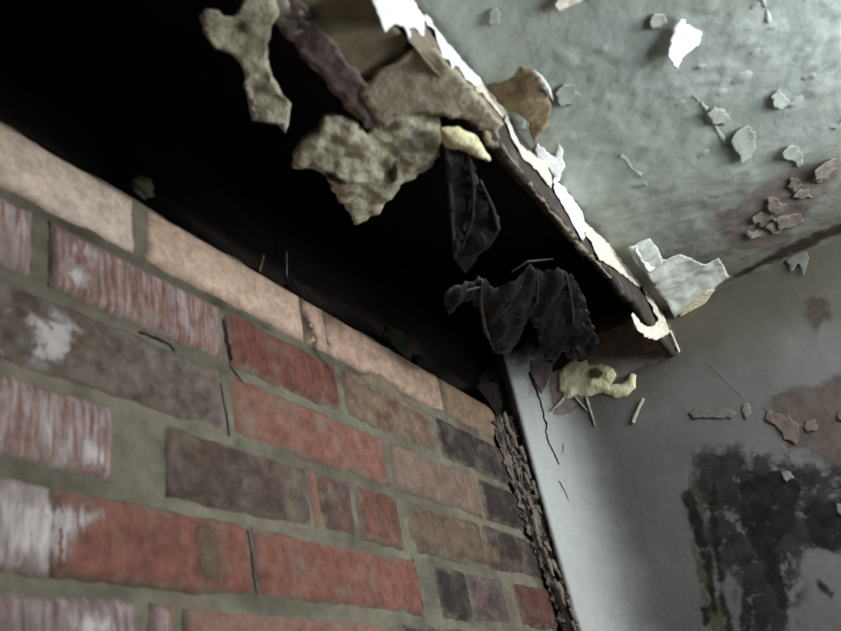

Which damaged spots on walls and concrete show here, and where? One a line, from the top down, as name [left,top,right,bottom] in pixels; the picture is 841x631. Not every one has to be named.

peeling [199,0,291,133]
peeling [649,13,702,68]
flaking render [360,0,680,415]
crack [528,372,569,500]
crack [247,529,257,594]
crack [492,394,582,631]
damp [682,449,841,631]